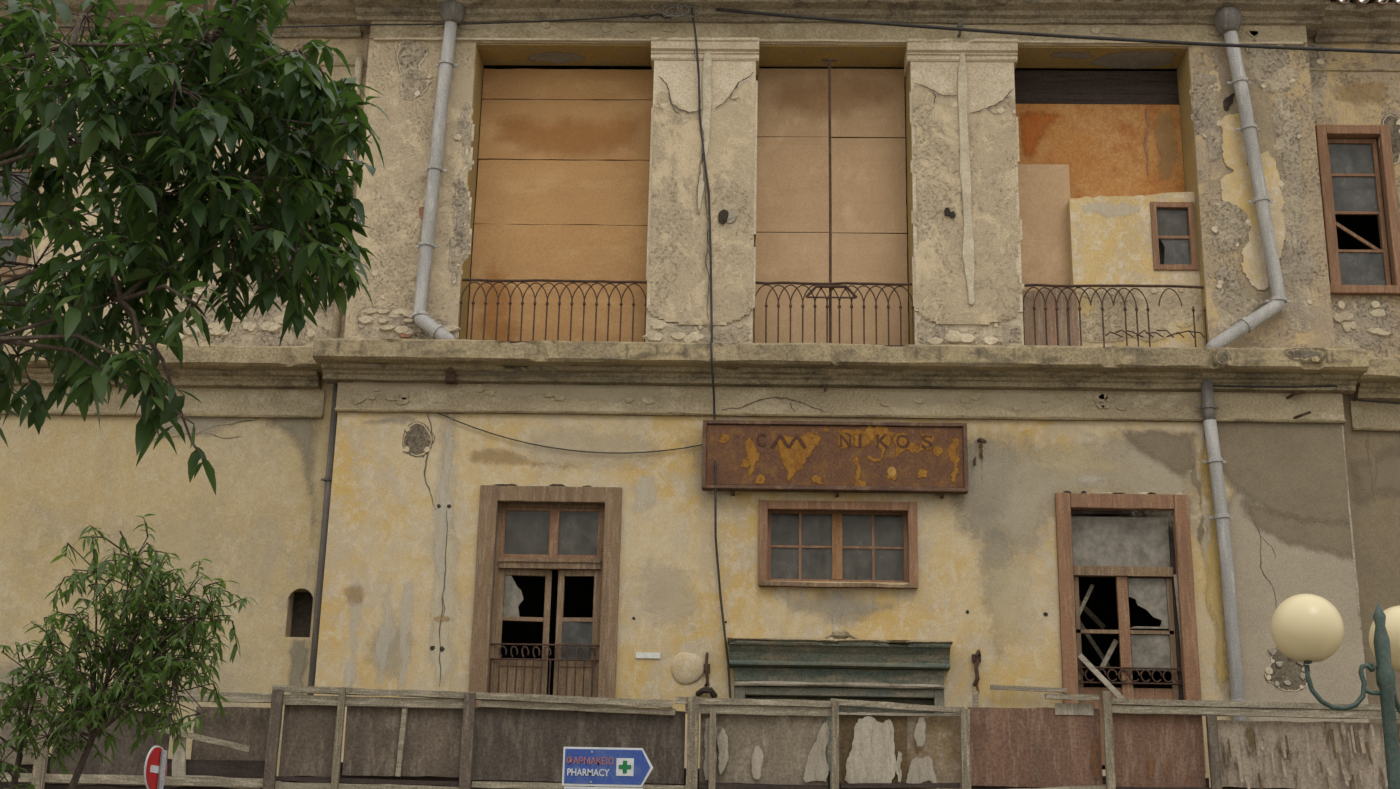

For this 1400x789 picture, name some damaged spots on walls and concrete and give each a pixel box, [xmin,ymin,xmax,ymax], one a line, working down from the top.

flaking render [171,117,461,346]
flaking render [396,22,522,100]
flaking render [448,102,474,286]
crack [658,50,754,319]
crack [914,83,1013,115]
flaking render [909,83,1024,345]
flaking render [1078,30,1392,367]
leakage [962,422,1400,723]
crack [1250,512,1277,608]
flaking render [1264,647,1311,692]